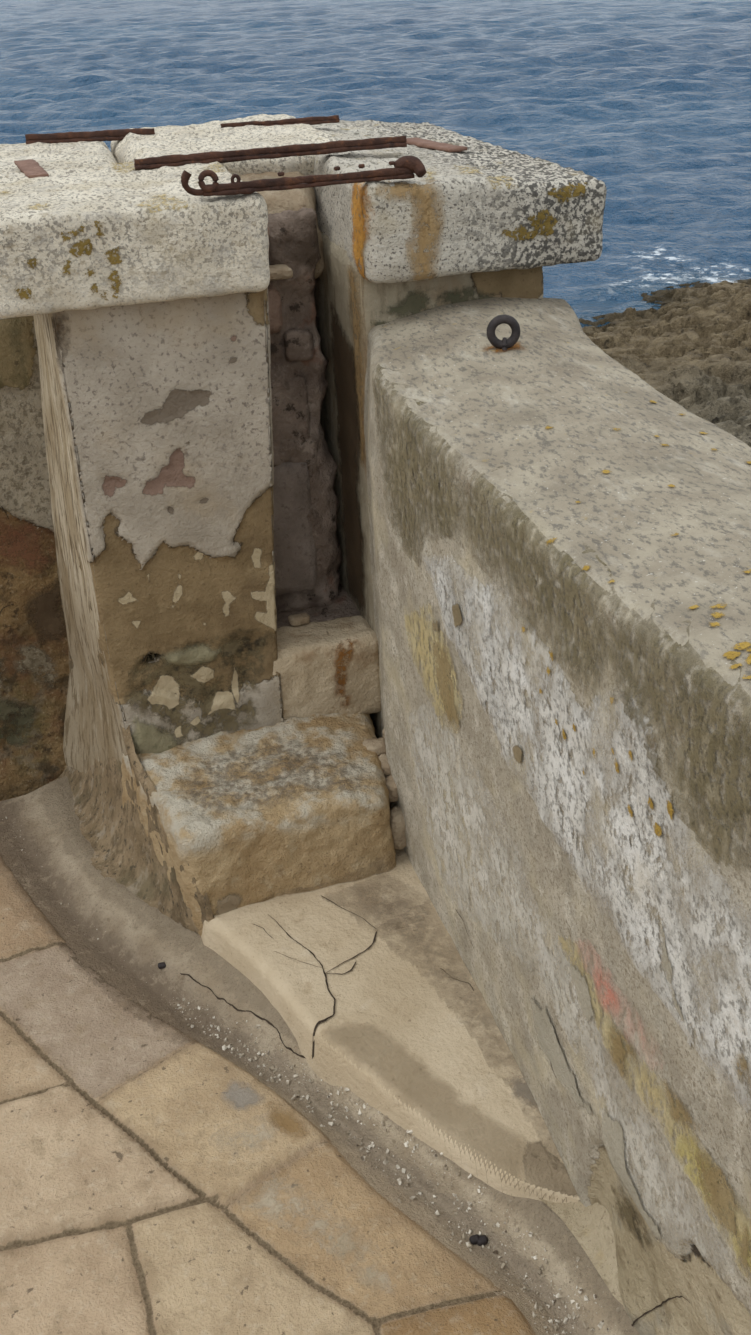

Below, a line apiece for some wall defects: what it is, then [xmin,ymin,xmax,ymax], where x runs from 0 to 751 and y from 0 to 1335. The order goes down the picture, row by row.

corrosion [348,181,442,464]
flaking render [102,476,127,497]
flaking render [142,448,208,514]
flaking render [140,389,211,426]
flaking render [0,508,70,801]
flaking render [79,486,280,738]
crack [180,896,377,1058]